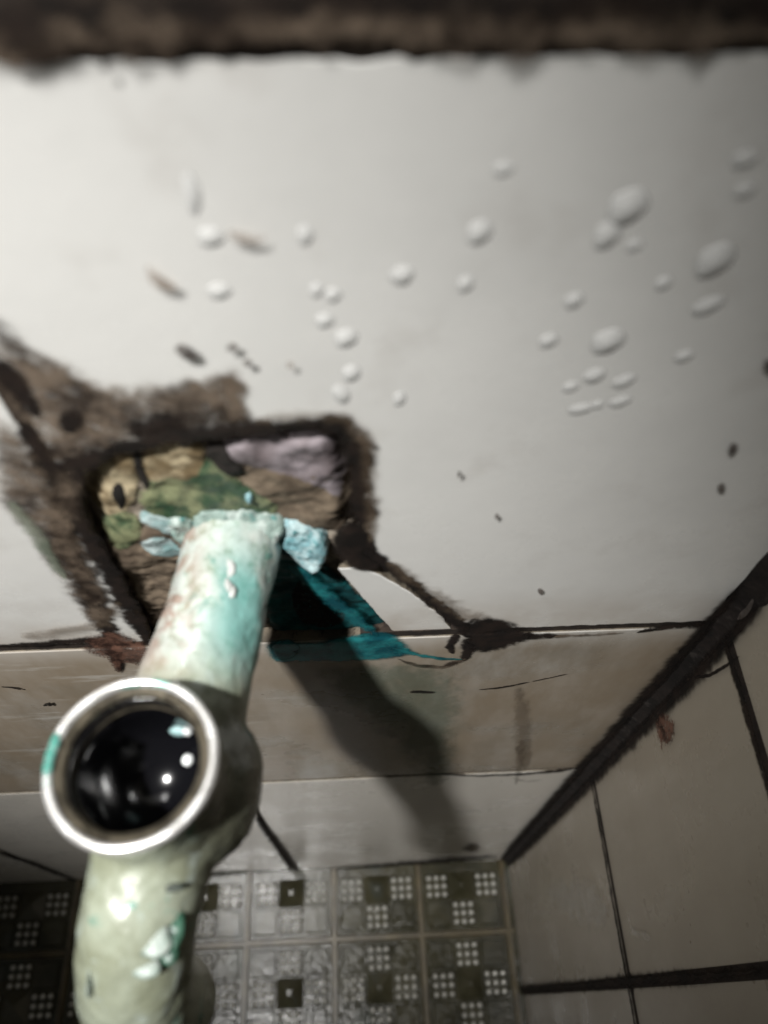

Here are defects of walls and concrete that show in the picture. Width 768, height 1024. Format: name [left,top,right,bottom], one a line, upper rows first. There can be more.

corrosion [84,632,147,673]
water stain [0,331,380,670]
spalling [80,429,385,631]
crack [362,549,475,693]